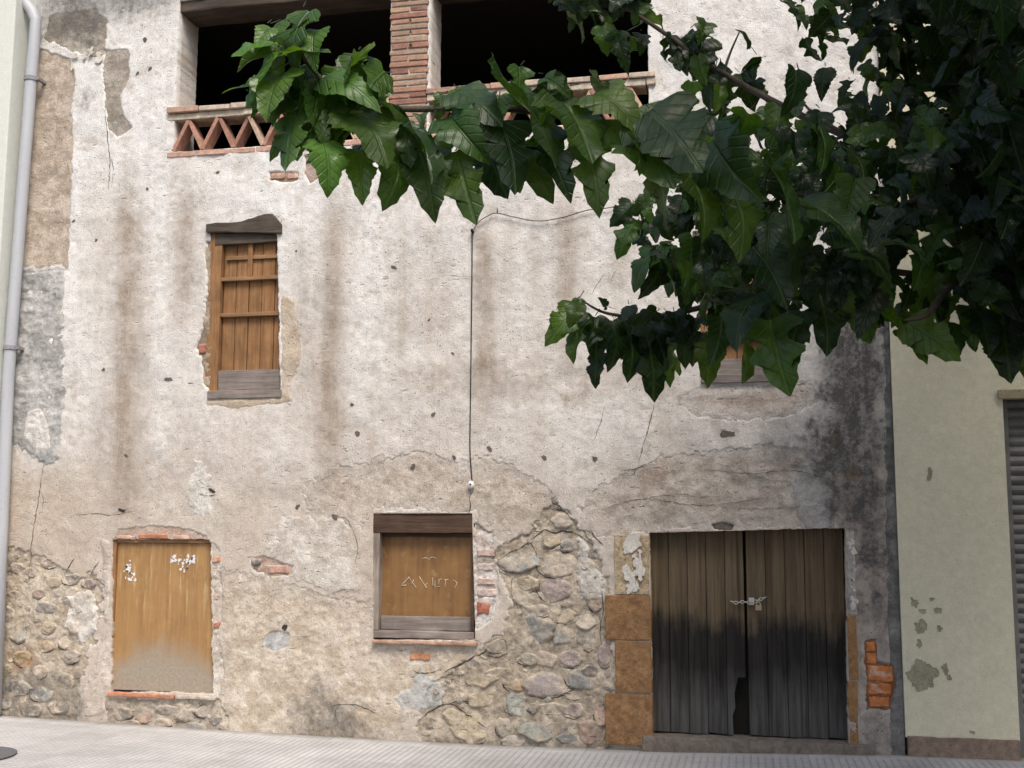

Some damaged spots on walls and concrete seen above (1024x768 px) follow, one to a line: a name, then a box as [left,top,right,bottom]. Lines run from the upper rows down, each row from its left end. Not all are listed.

peeling [23,9,152,270]
peeling [115,446,558,741]
peeling [577,381,819,594]
crack [608,408,824,509]
damp [803,322,893,618]
flaking render [864,597,952,710]